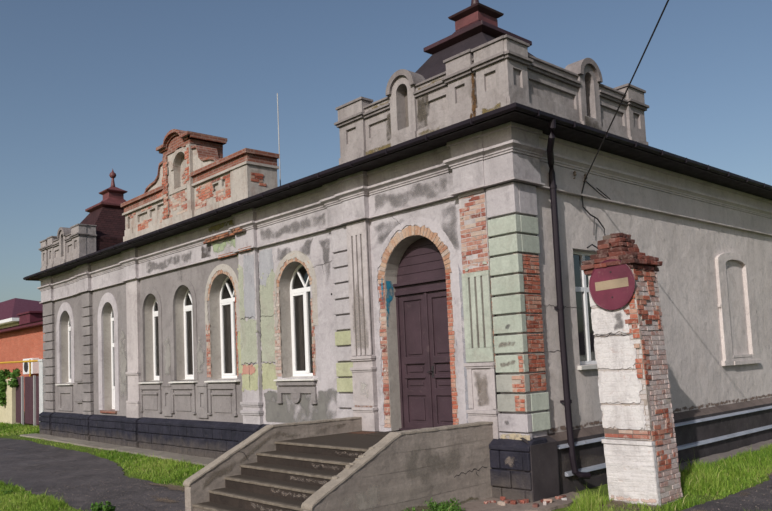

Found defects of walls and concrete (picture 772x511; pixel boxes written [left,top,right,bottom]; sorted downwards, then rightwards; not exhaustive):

flaking render [128,147,231,231]
flaking render [250,169,266,187]
peeling [205,246,318,392]
flaking render [373,194,490,428]
flaking render [512,253,547,412]
flaking render [624,269,661,385]
flaking render [550,394,772,471]